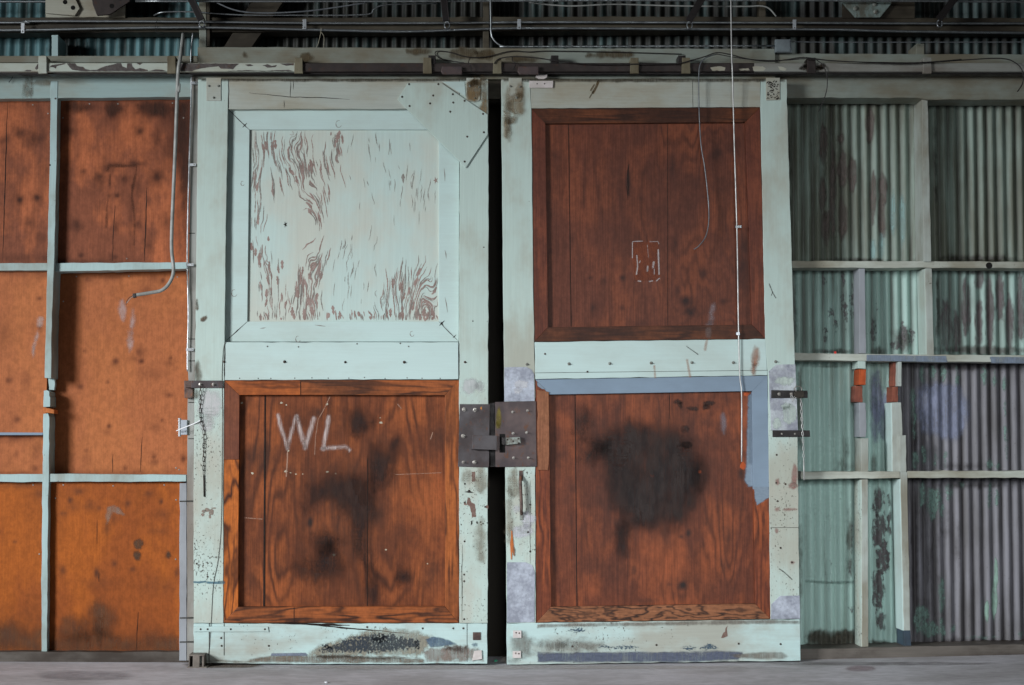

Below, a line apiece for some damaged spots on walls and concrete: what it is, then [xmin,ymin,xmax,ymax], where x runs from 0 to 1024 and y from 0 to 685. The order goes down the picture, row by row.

corrosion [504,88,523,137]
peeling [250,131,438,321]
corrosion [941,274,1024,352]
water stain [310,439,398,562]
water stain [587,424,700,551]
peeling [311,629,429,656]